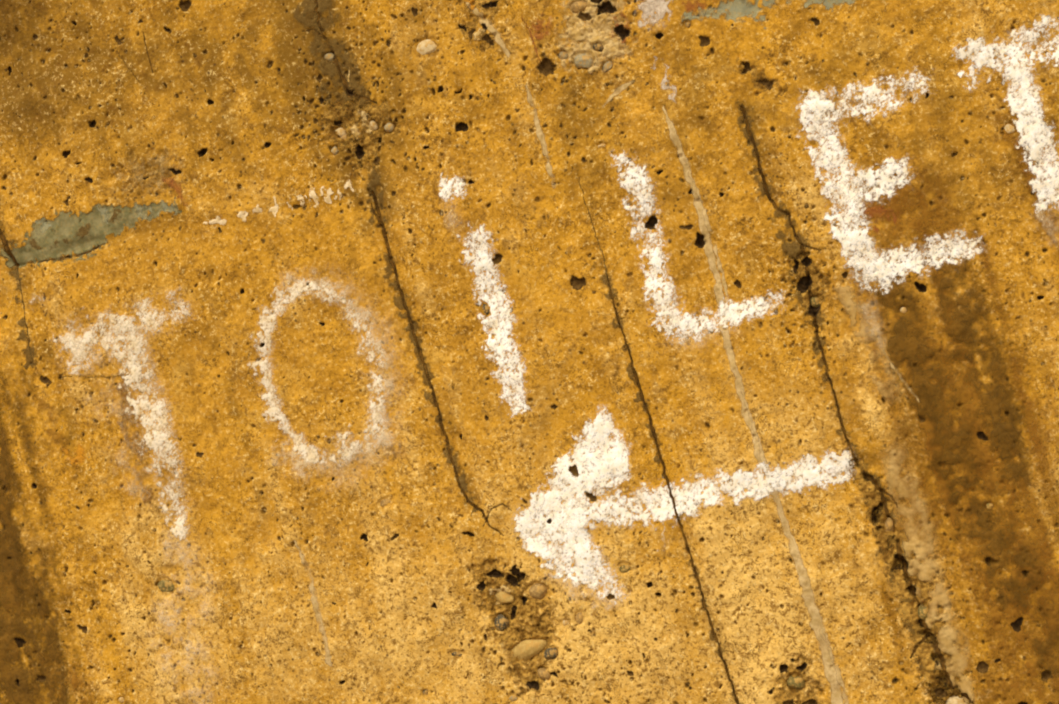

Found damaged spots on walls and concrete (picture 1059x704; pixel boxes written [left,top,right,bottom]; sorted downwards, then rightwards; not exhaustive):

spalling [458,0,499,52]
spalling [559,0,638,74]
peeling [0,158,182,268]
leakage [995,111,1059,250]
crack [367,169,512,536]
crack [579,178,739,704]
crack [737,102,969,704]
leakage [857,169,1059,704]
spalling [471,559,583,701]